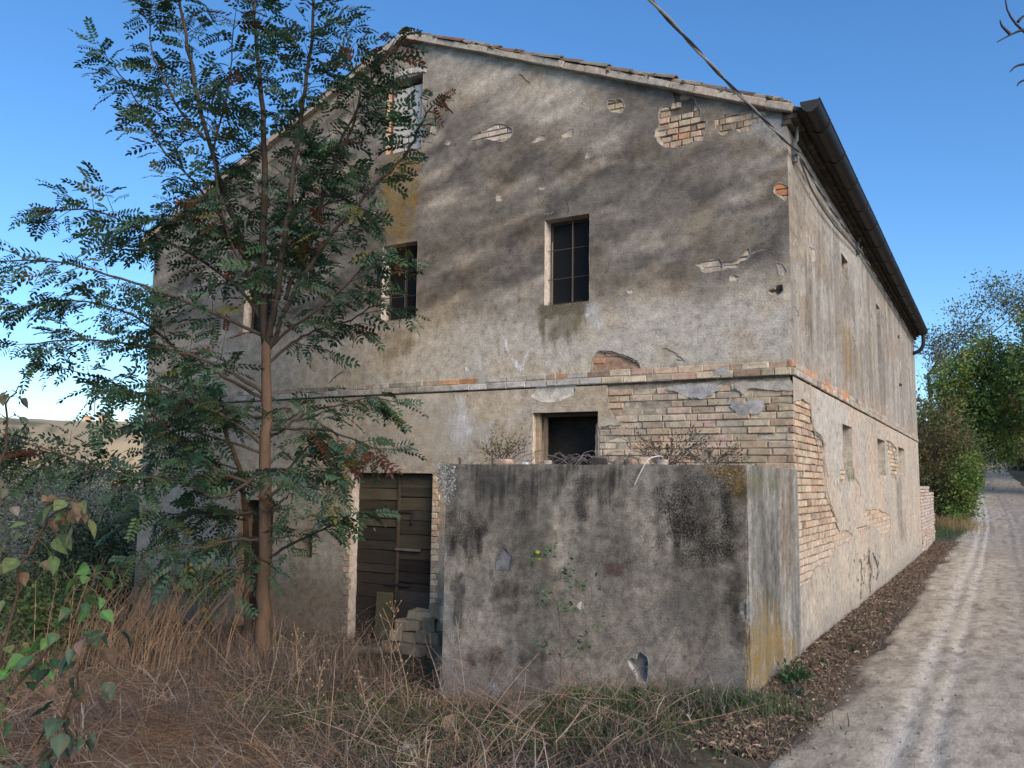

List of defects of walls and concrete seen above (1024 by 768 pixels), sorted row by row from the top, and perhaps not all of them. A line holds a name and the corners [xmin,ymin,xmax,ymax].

spalling [468,123,513,143]
spalling [606,99,625,113]
spalling [654,92,767,148]
spalling [773,183,789,203]
spalling [695,247,751,283]
spalling [530,350,891,587]
damp [446,506,487,562]
damp [654,465,746,567]
spalling [626,651,649,685]